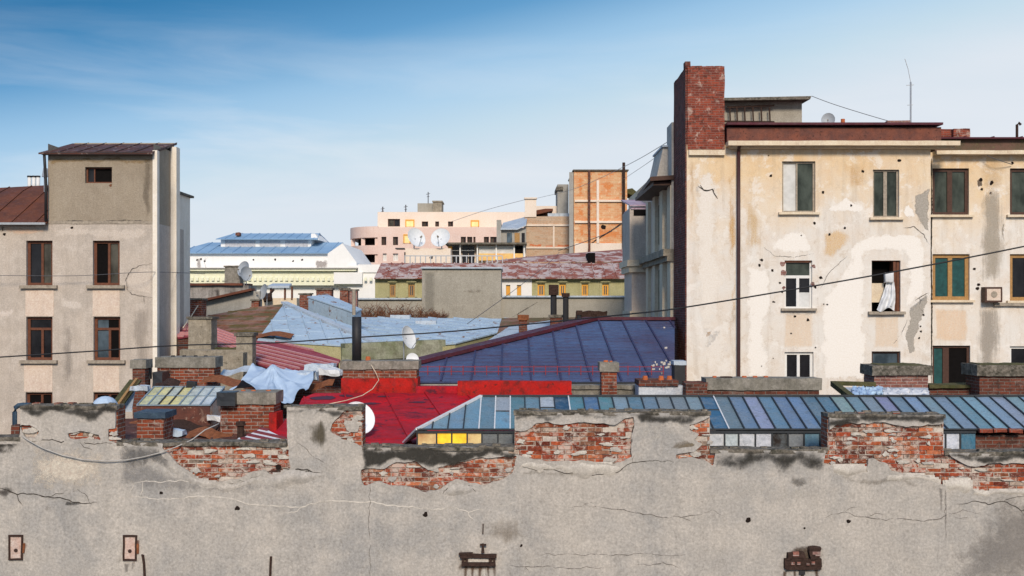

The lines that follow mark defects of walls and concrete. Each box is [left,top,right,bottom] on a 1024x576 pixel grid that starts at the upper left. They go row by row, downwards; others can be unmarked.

water stain [975,161,1007,276]
peeling [745,189,929,380]
spalling [163,439,290,482]
spalling [330,410,364,446]
spalling [361,410,634,492]
spalling [824,412,1024,491]
crack [1,444,514,574]